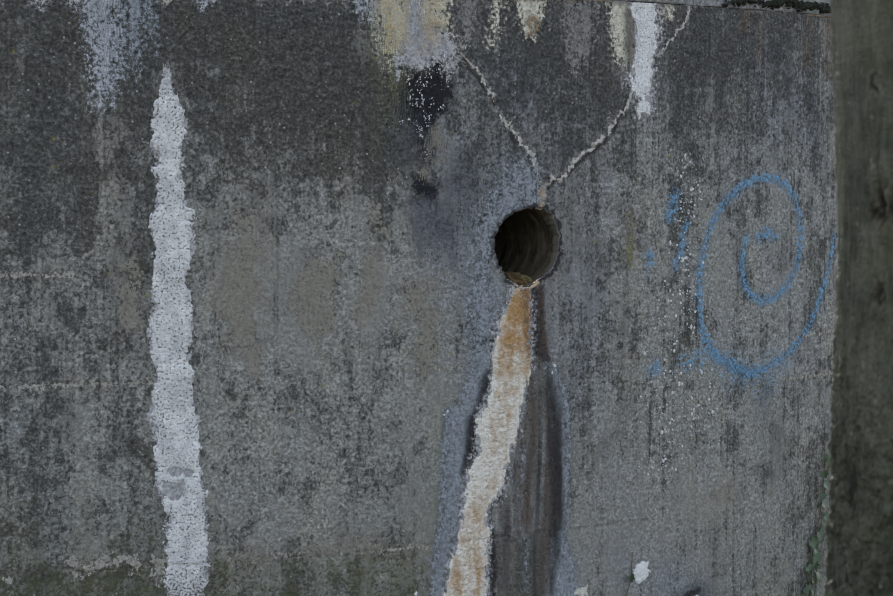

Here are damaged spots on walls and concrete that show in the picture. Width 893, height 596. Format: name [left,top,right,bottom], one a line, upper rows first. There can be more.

damp [75,0,213,596]
damp [349,0,675,596]
crack [462,54,632,210]
crack [653,6,692,58]